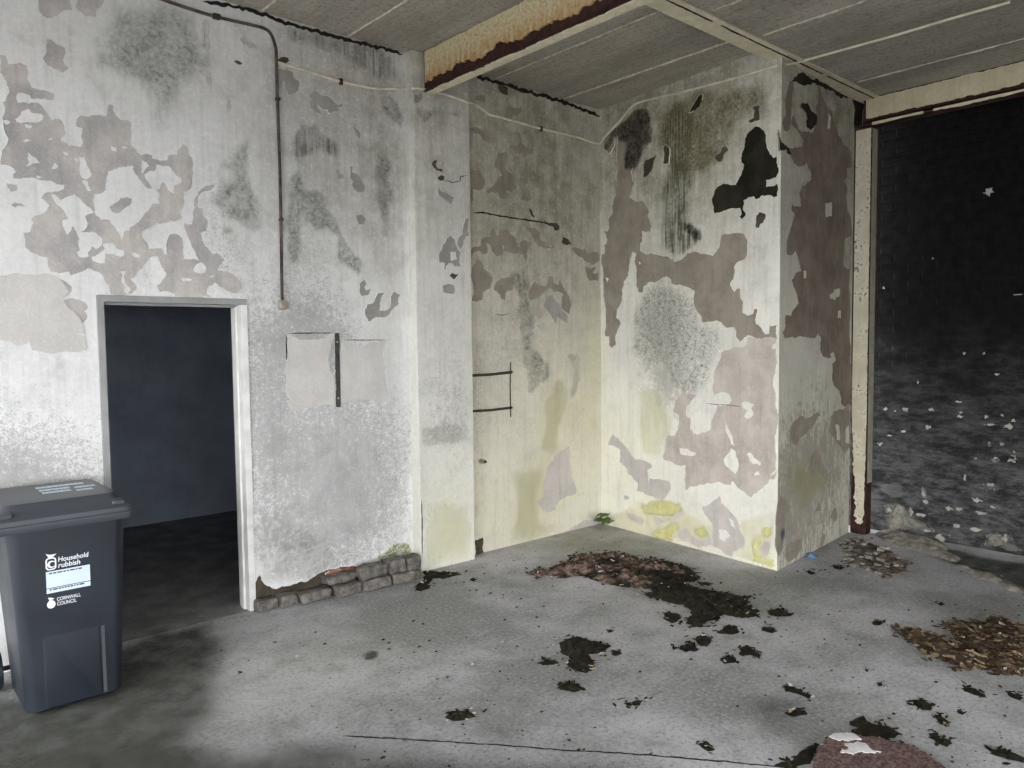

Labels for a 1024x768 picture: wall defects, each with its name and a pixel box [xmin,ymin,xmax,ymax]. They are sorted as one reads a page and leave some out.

peeling [43,39,68,73]
leakage [119,14,198,89]
peeling [0,55,242,323]
leakage [606,91,763,252]
peeling [360,280,400,322]
peeling [439,61,1024,562]